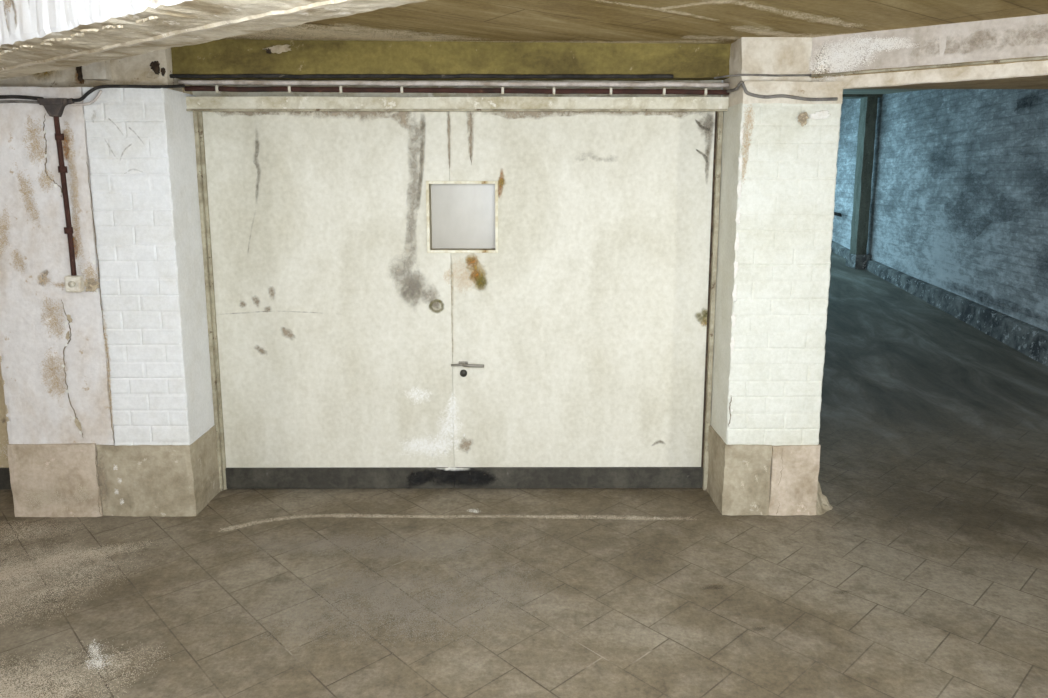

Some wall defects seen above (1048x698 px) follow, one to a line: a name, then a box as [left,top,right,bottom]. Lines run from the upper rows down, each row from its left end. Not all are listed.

damp [13,160,40,225]
damp [291,111,425,250]
damp [0,204,27,273]
damp [395,261,443,312]
corrosion [443,257,486,295]